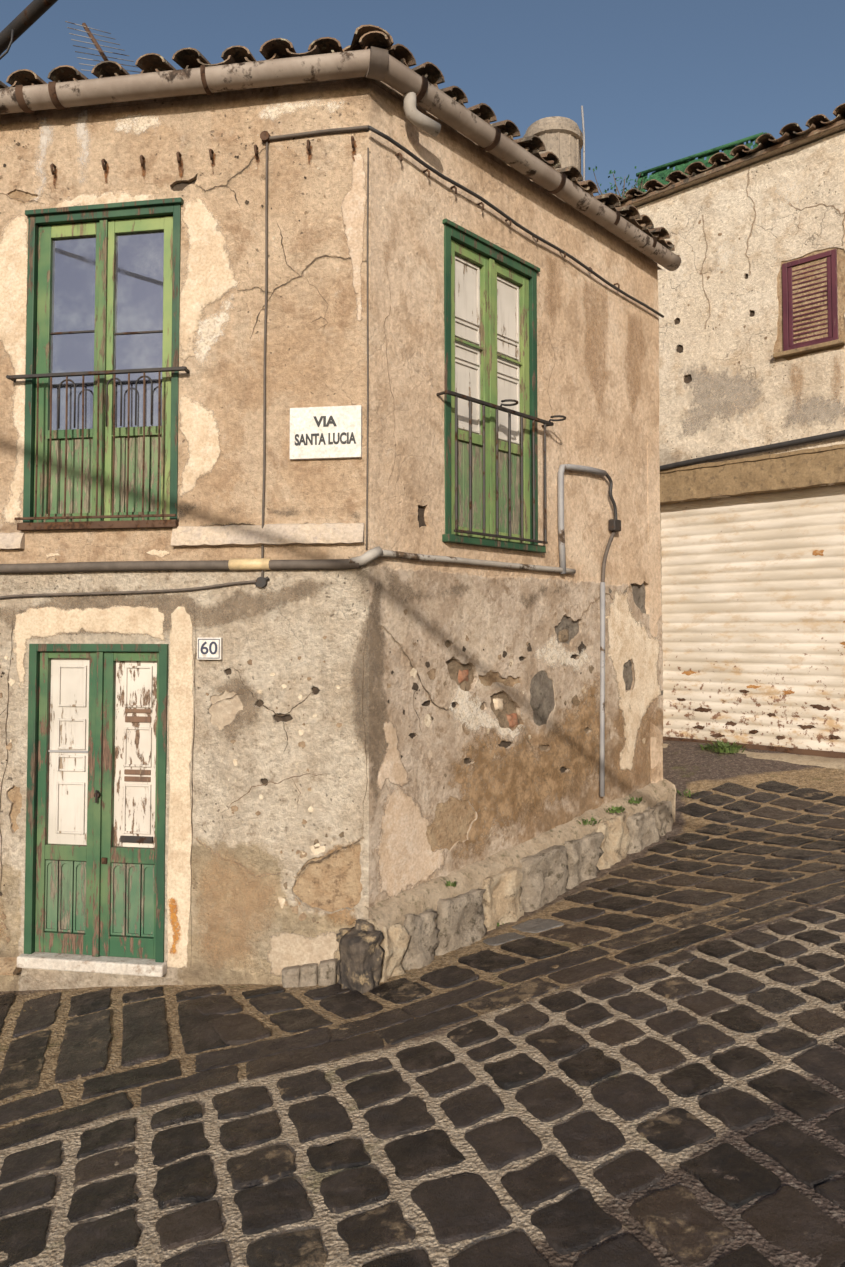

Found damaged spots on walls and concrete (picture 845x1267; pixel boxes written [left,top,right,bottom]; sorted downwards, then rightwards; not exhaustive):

peeling [0,132,39,524]
peeling [53,191,156,208]
peeling [172,179,240,362]
crack [196,147,266,206]
crack [701,215,710,329]
crack [745,171,845,276]
peeling [179,396,221,497]
flaking render [206,656,326,788]
crack [190,602,380,954]
crack [362,596,461,802]
flaking render [376,612,598,790]
peeling [605,583,663,771]